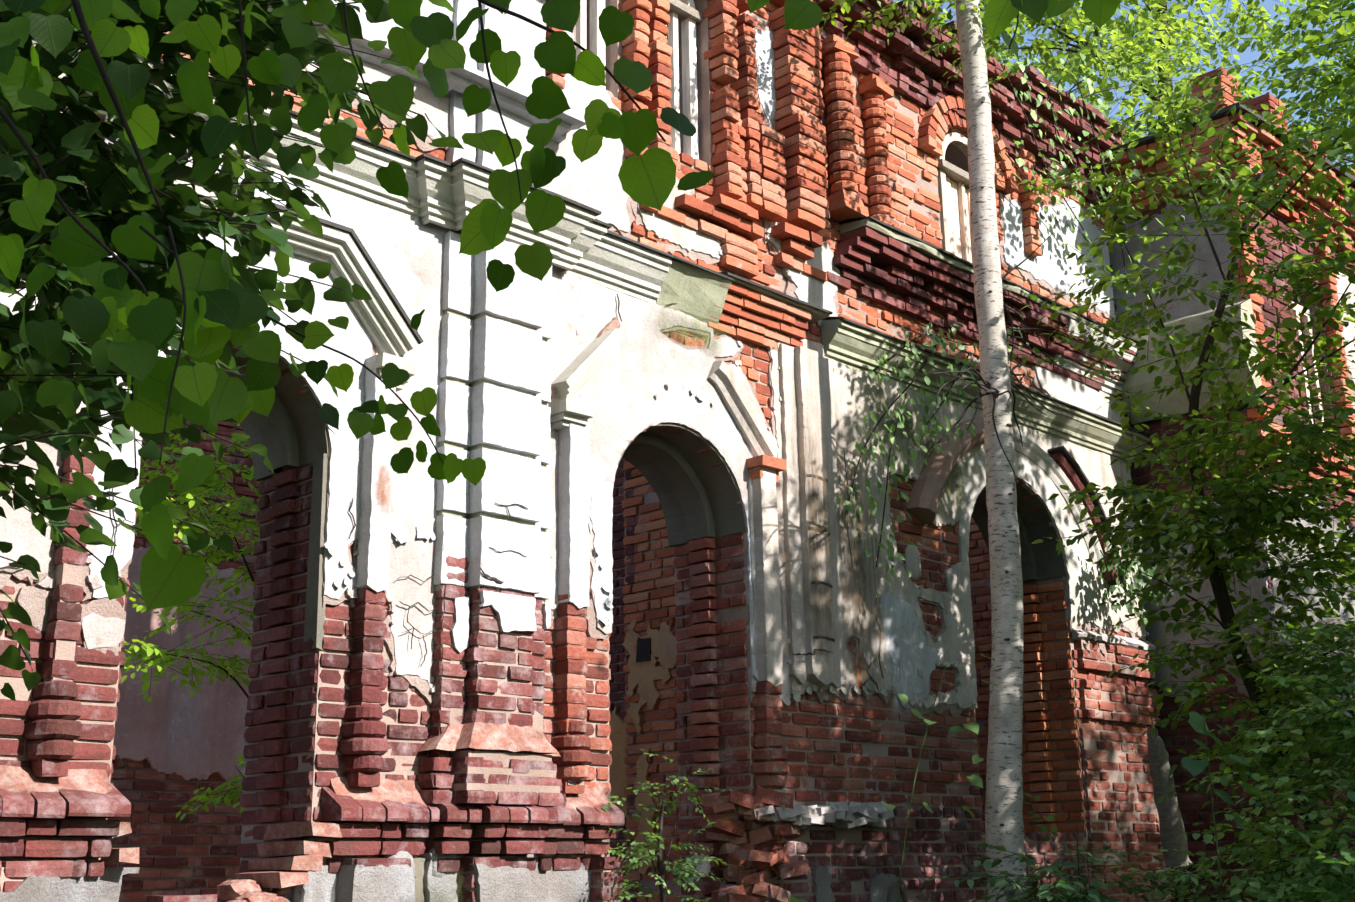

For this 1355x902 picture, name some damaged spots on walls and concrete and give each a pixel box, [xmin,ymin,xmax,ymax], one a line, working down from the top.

spalling [645,218,797,293]
spalling [0,576,56,768]
spalling [79,545,103,604]
spalling [68,632,121,778]
spalling [315,541,359,786]
spalling [379,655,437,781]
peeling [391,521,436,544]
crack [398,574,438,667]
spalling [543,603,557,743]
spalling [584,546,614,794]
spalling [701,660,982,902]
spalling [888,471,959,643]